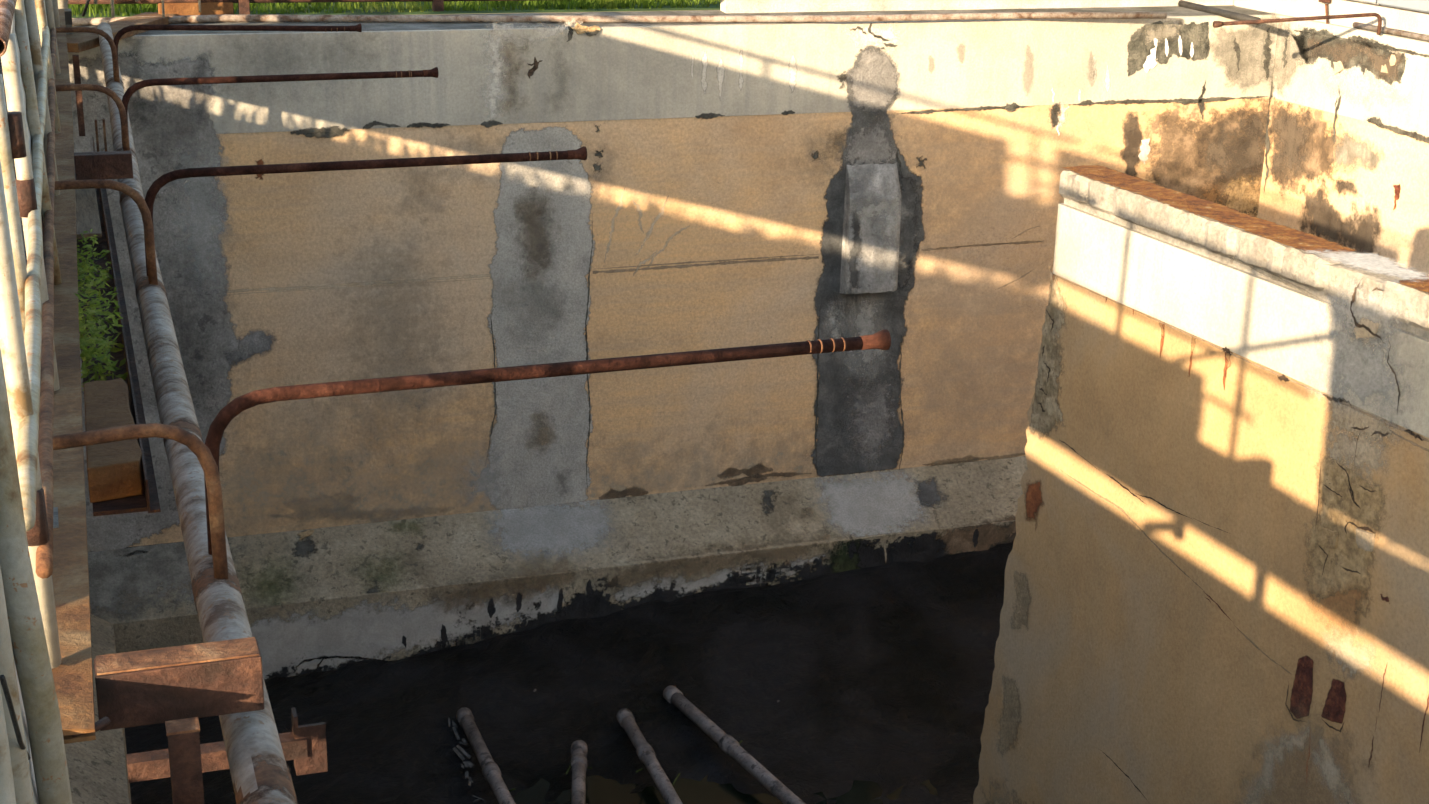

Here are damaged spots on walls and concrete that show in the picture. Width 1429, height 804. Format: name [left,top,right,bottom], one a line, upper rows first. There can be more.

spalling [1127,21,1210,76]
peeling [1292,27,1406,85]
damp [1072,15,1429,279]
crack [922,226,1044,290]
peeling [1029,269,1067,439]
rust [1223,351,1233,389]
crack [1065,280,1429,452]
damp [250,515,1016,680]
rust [1026,481,1044,531]
crack [1060,440,1289,673]
spalling [1303,394,1398,631]